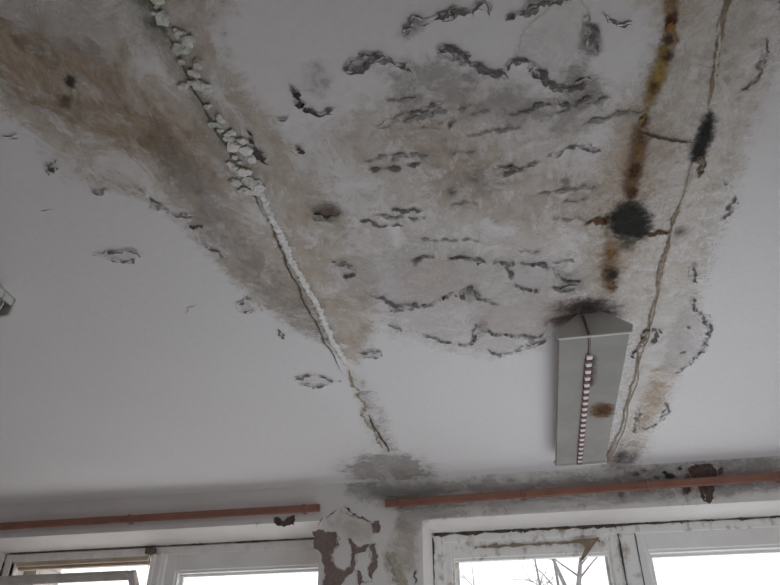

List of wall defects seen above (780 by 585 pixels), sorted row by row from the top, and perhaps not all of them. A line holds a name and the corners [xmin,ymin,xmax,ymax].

peeling [289,85,339,118]
rust [623,0,680,199]
crack [708,0,732,109]
leakage [0,0,378,361]
crack [139,0,389,452]
peeling [365,0,780,465]
rust [556,242,619,320]
rust [581,217,610,227]
crack [607,165,693,459]
leakage [344,443,636,523]
spalling [657,463,724,504]
spalling [312,506,381,585]